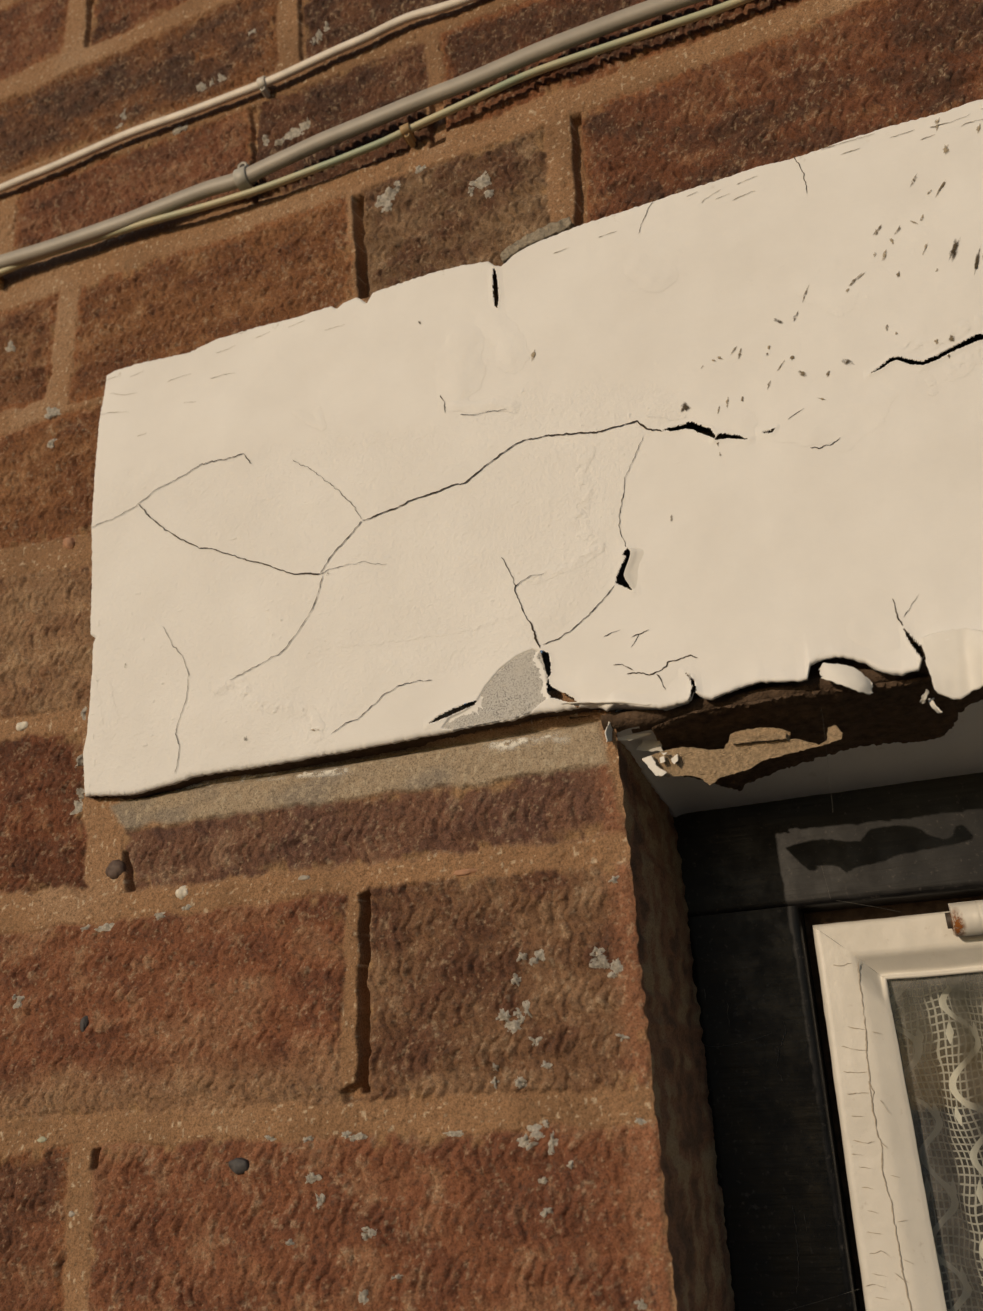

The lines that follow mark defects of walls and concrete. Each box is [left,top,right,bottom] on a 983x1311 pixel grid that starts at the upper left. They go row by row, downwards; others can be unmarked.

crack [879,338,983,370]
crack [91,420,747,679]
crack [332,680,428,733]
peeling [443,650,548,730]
crack [501,557,697,719]
spalling [562,628,983,791]